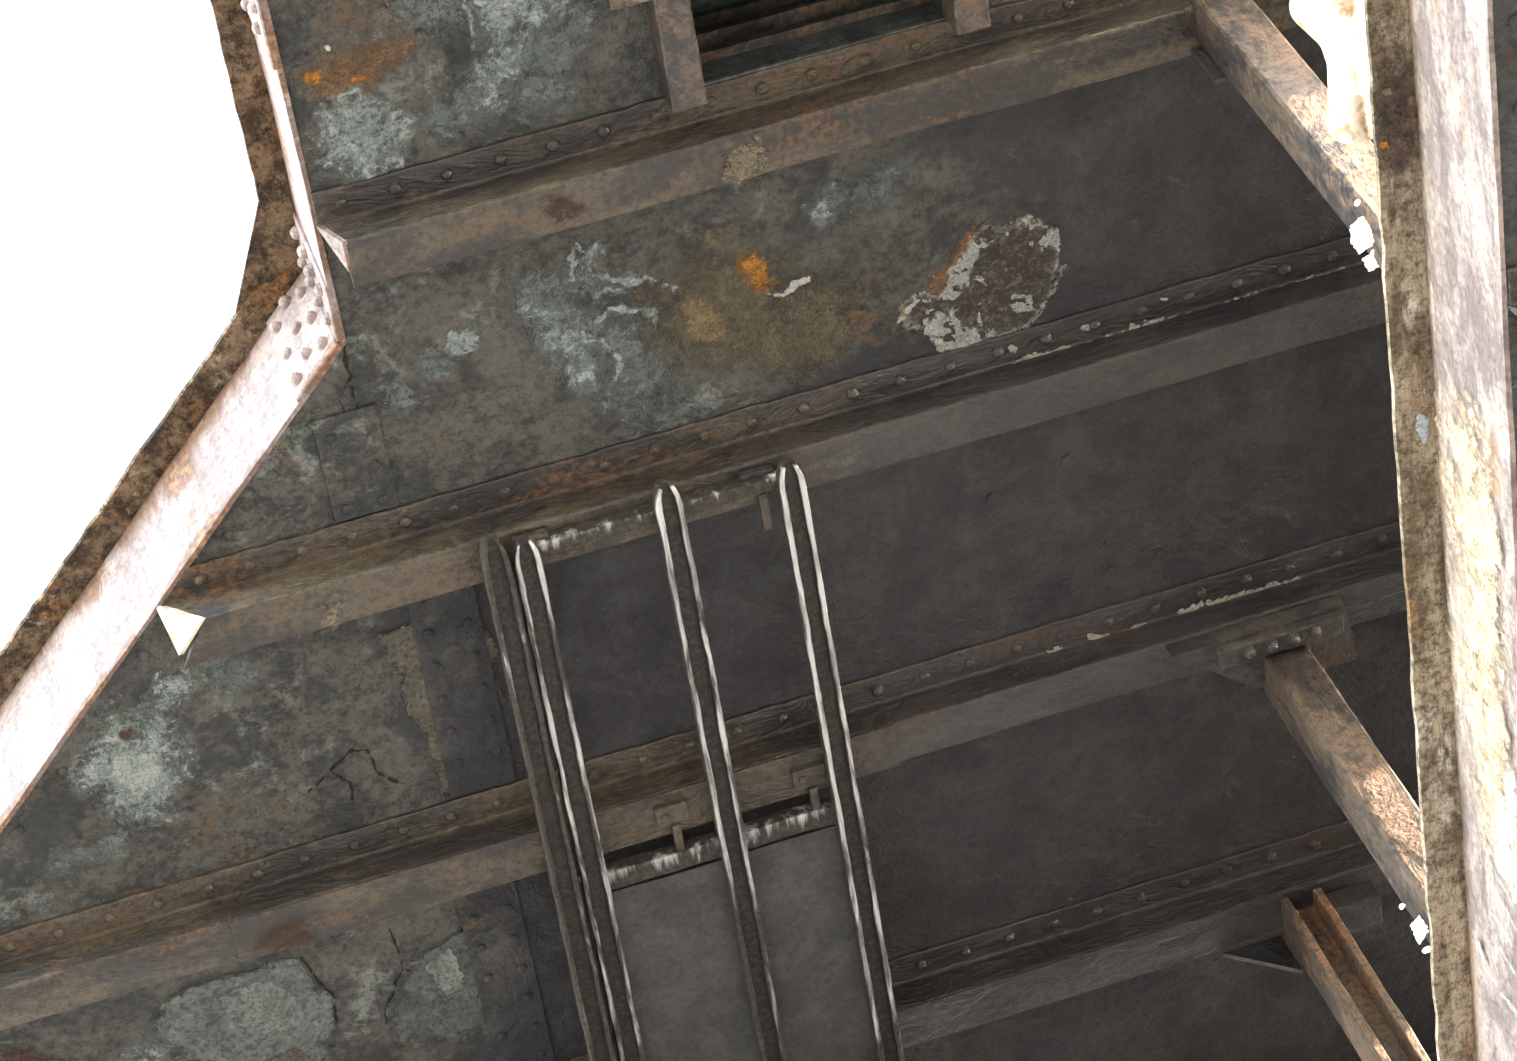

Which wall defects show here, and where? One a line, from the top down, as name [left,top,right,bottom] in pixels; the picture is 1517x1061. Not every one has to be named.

rust [296,34,417,108]
damp [314,0,599,182]
rust [643,227,857,377]
peeling [897,214,1067,353]
rust [1435,385,1517,893]
crack [308,749,403,801]
crack [300,957,338,1061]
crack [384,929,413,1025]